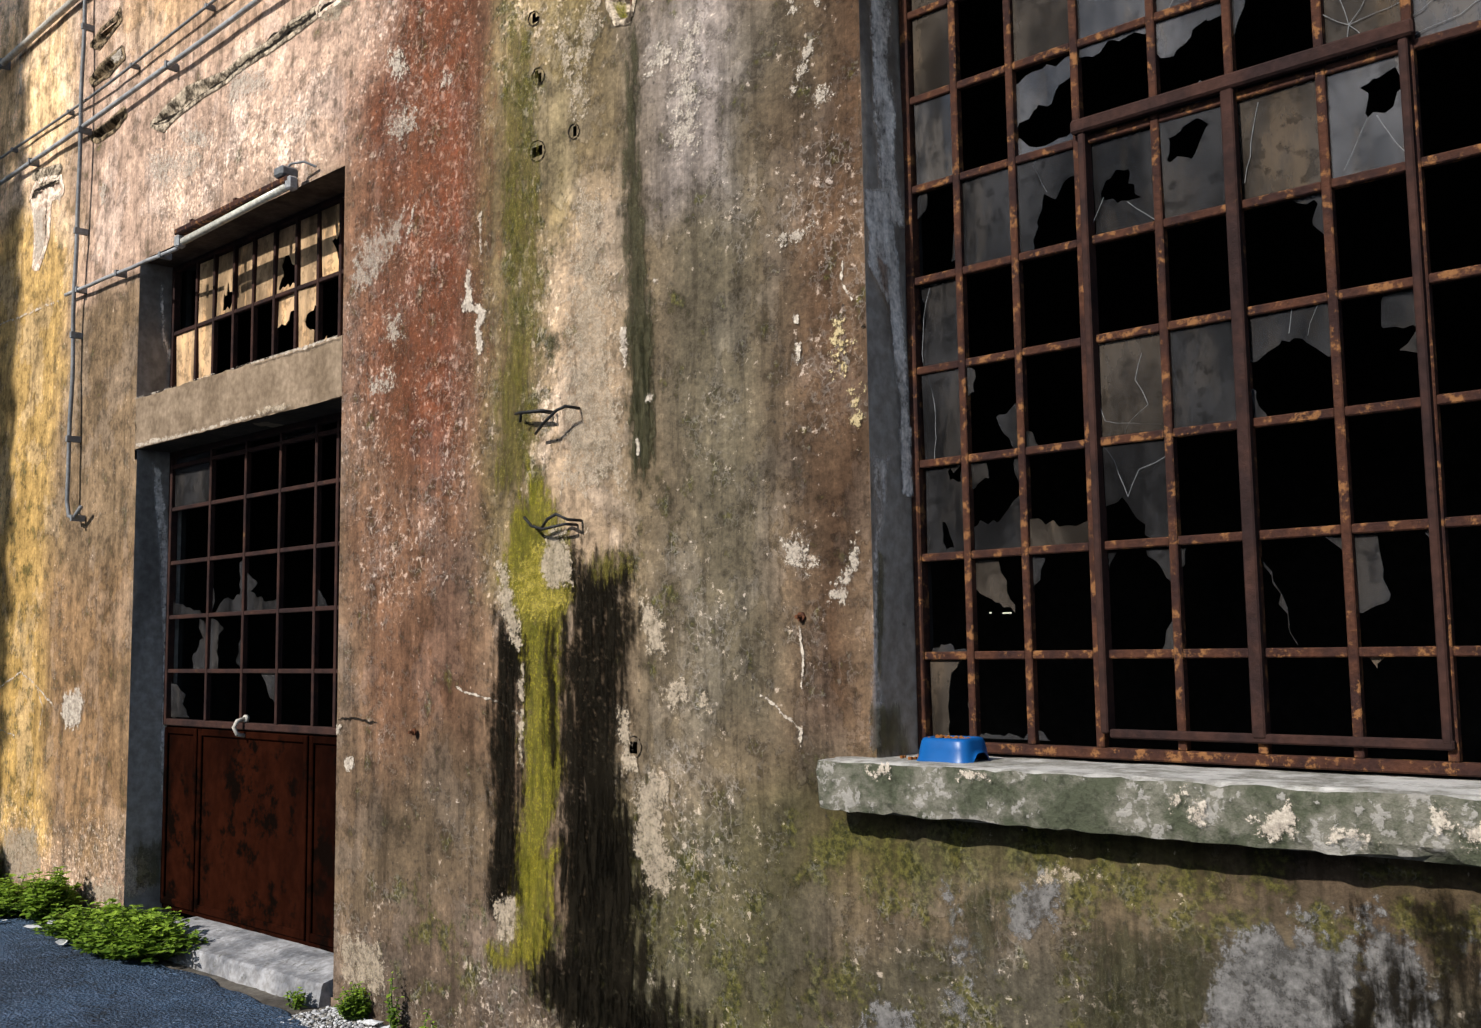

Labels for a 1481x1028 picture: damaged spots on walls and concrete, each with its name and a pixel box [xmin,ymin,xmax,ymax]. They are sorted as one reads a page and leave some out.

flaking render [89,7,125,87]
spalling [605,0,636,26]
flaking render [88,106,127,144]
flaking render [29,163,64,271]
peeling [830,0,913,779]
damp [484,537,716,1028]
spalling [1169,784,1207,827]
spalling [1246,799,1298,843]
spalling [1326,826,1371,844]
spalling [1429,806,1481,843]
damp [1084,923,1205,1028]
damp [1326,890,1481,1028]